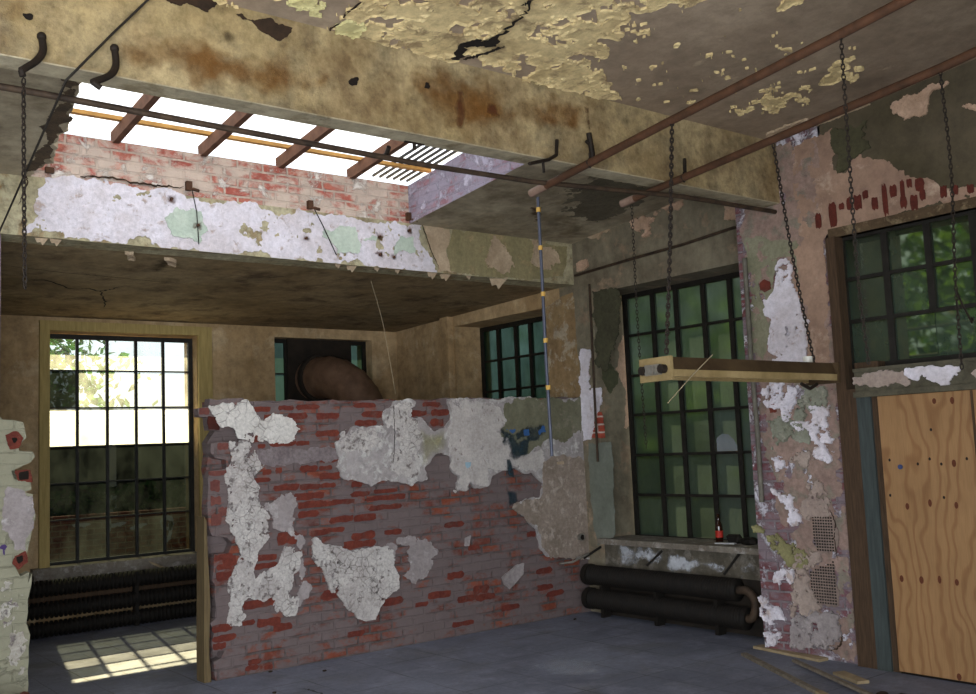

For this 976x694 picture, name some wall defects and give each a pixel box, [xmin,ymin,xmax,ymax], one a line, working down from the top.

flaking render [166,0,292,41]
leakage [187,46,287,88]
leakage [422,79,500,121]
peeling [274,0,705,100]
crack [451,0,533,60]
peeling [24,175,589,289]
peeling [729,46,976,363]
peeling [852,365,976,387]
peeling [1,469,35,570]
peeling [199,335,629,650]
peeling [761,382,835,527]
peeling [751,525,857,662]